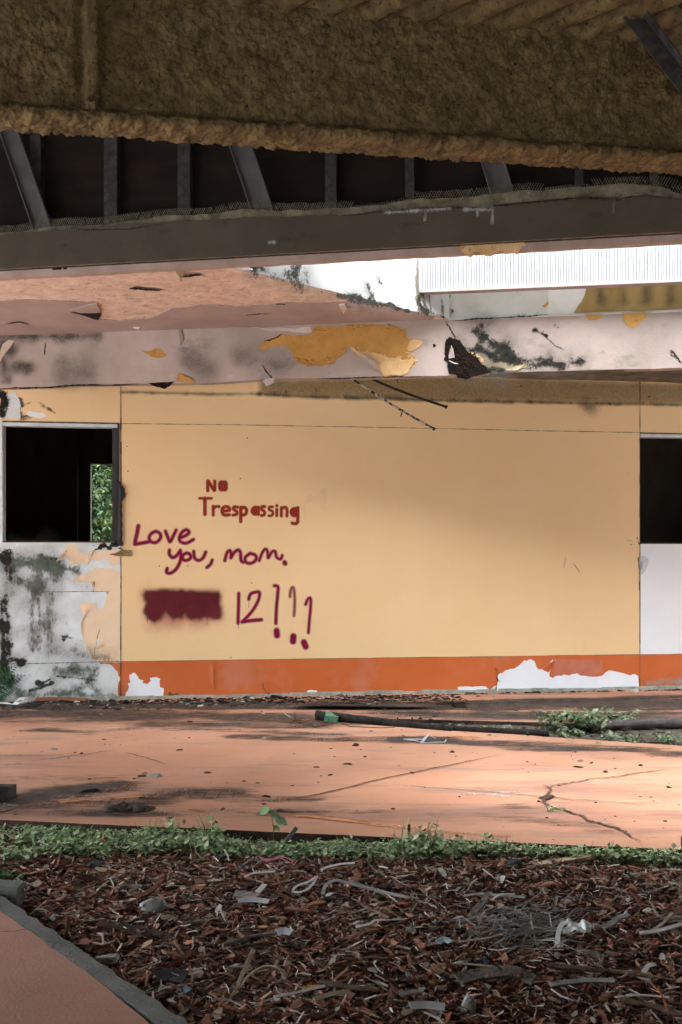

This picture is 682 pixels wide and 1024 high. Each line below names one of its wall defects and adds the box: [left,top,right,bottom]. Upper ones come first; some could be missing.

peeling [0,285,528,379]
damp [262,324,682,409]
peeling [57,544,164,696]
damp [0,549,682,756]
peeling [458,659,639,691]
crack [278,754,679,842]